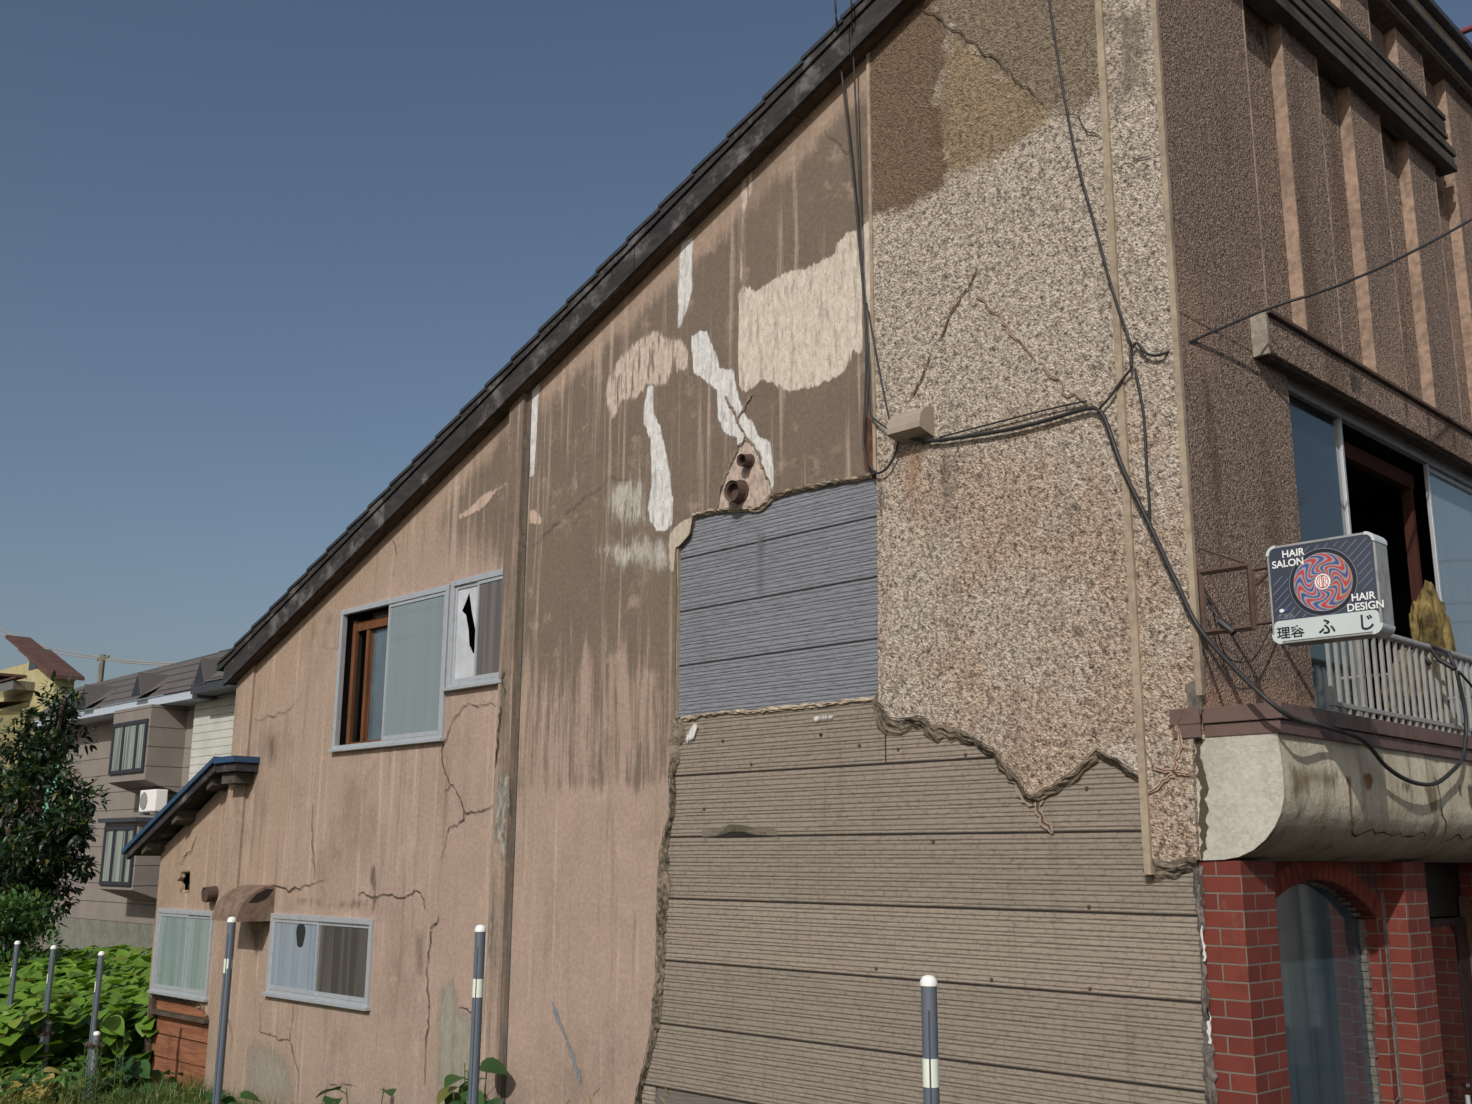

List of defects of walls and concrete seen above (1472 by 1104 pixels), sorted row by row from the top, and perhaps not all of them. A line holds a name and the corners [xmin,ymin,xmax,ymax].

peeling [606,171,874,570]
crack [274,823,323,892]
crack [358,890,472,1086]
crack [440,671,505,860]
spalling [634,692,1139,1104]
spalling [1141,847,1203,906]
spalling [1185,681,1203,713]
crack [1346,776,1472,842]